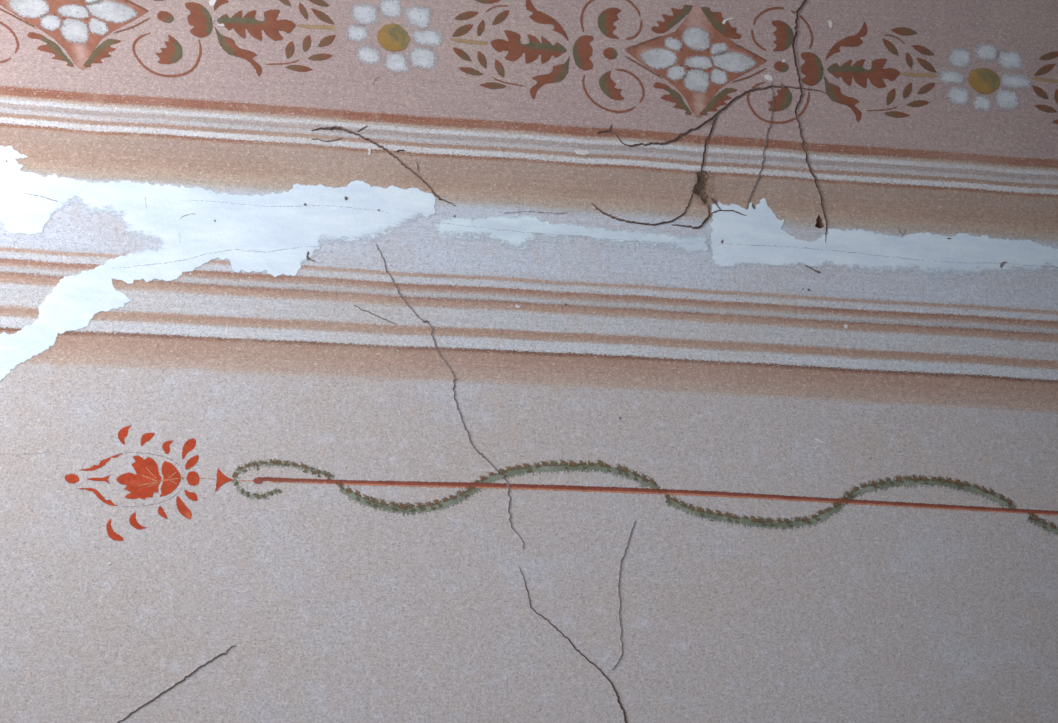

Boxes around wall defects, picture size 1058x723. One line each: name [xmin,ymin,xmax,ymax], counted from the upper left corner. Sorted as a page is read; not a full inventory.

crack [311,0,1054,267]
crack [354,245,635,723]